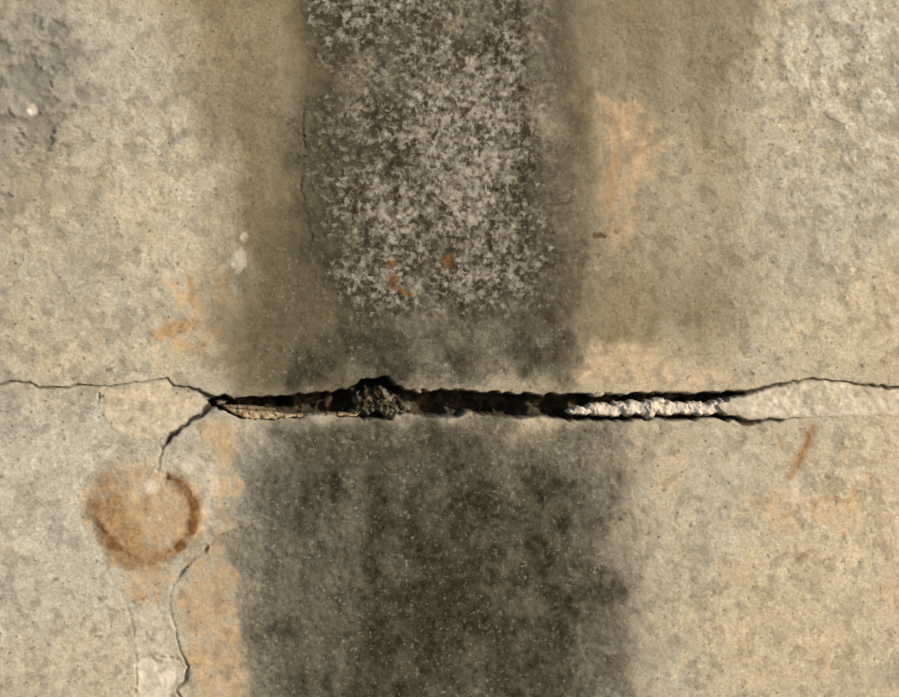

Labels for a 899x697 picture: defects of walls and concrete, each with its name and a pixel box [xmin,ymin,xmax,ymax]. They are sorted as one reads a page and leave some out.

damp [143,0,803,396]
rust [80,414,253,697]
crack [119,519,266,697]
damp [174,415,676,697]
crack [0,374,899,476]